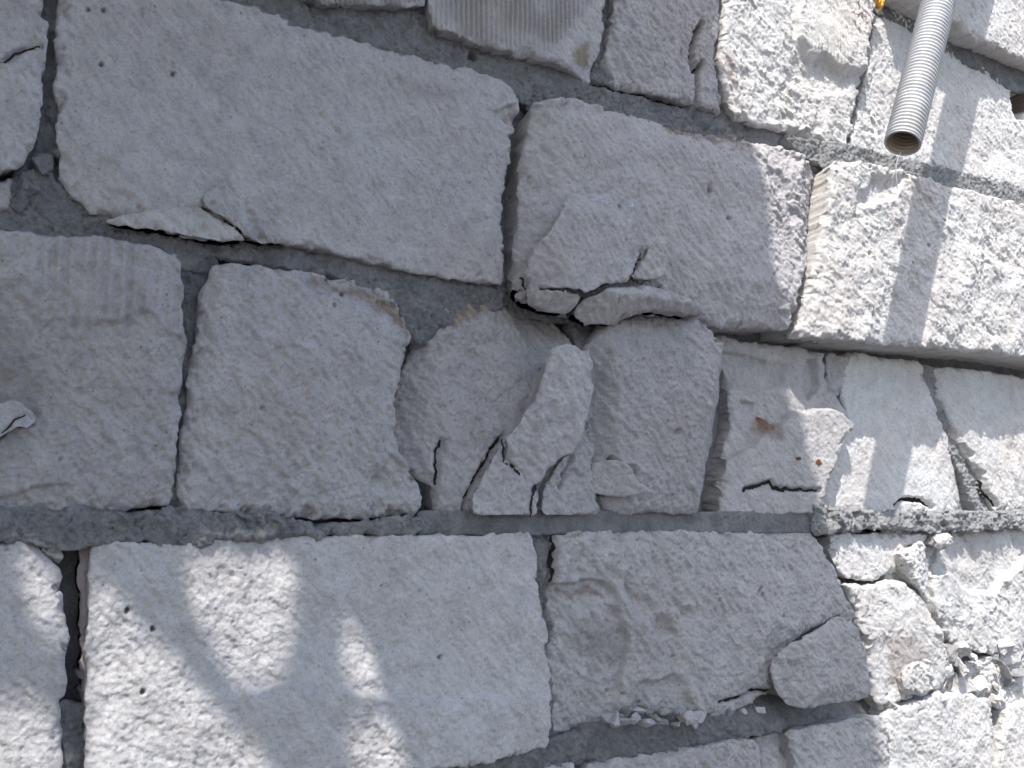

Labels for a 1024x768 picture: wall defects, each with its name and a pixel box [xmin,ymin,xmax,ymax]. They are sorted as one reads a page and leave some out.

crack [202,205,251,266]
crack [519,253,648,317]
rust [753,417,780,436]
crack [433,440,441,485]
crack [460,437,539,517]
crack [742,480,817,492]
crack [893,497,928,507]
crack [976,480,994,506]
crack [547,535,556,582]
crack [718,688,769,702]